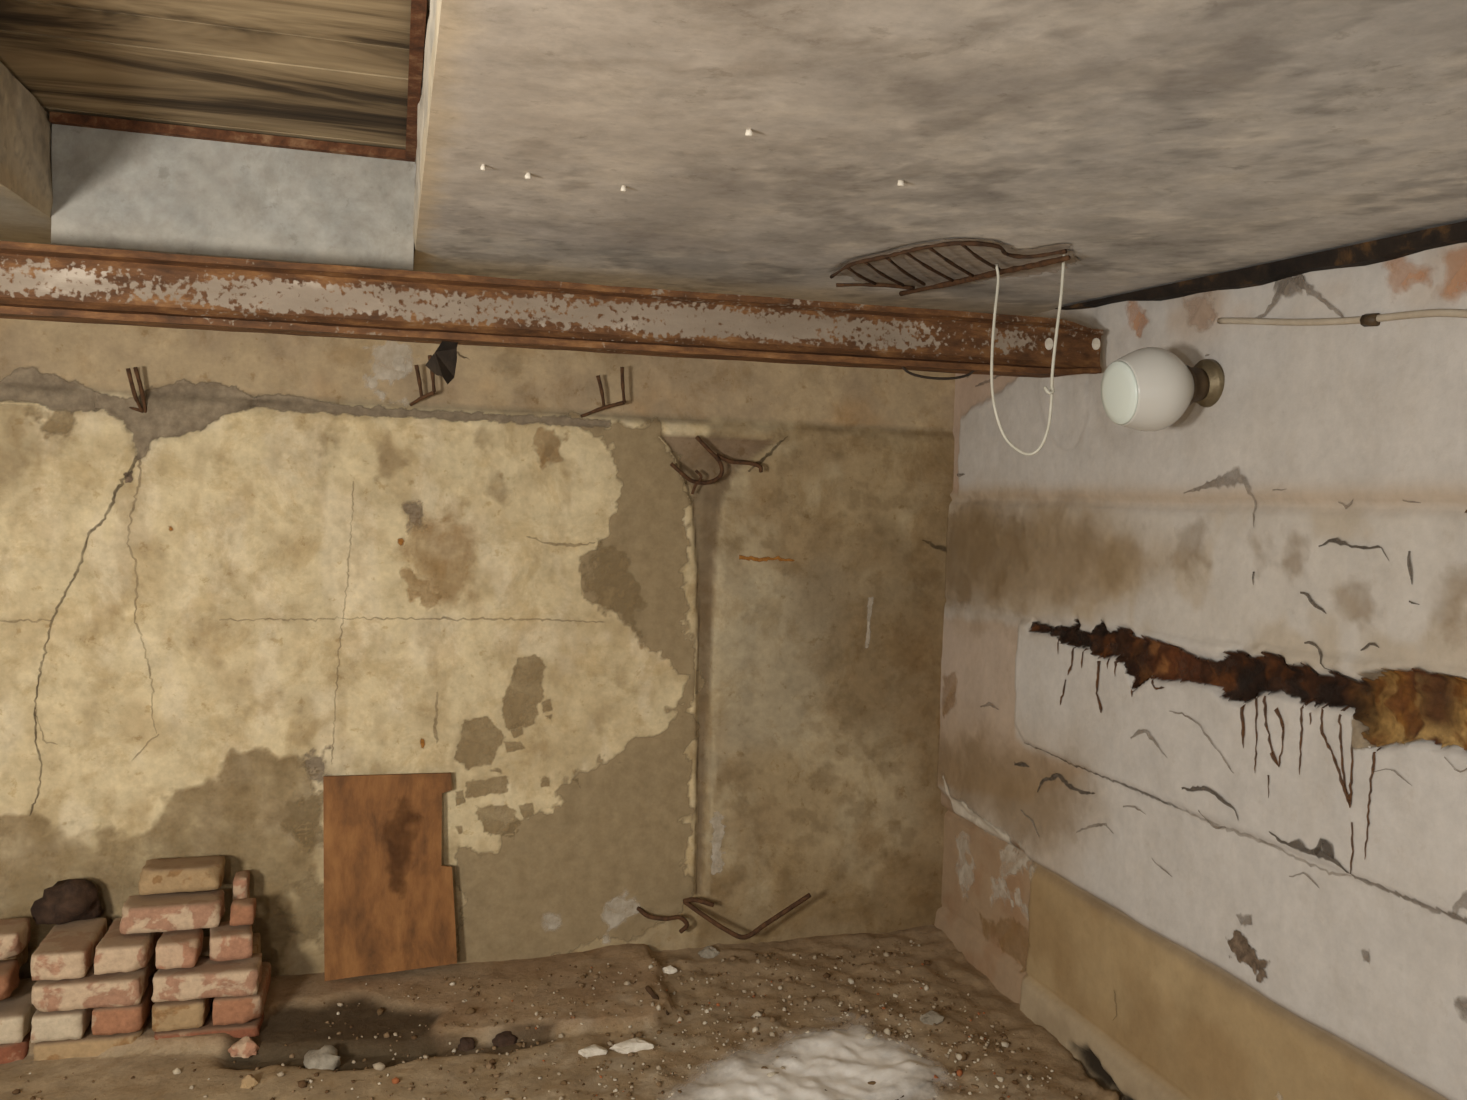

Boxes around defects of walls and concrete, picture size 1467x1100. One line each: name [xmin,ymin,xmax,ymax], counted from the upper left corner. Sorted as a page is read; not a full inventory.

spalling [830,238,1080,296]
peeling [1259,274,1344,318]
crack [31,461,136,812]
peeling [0,355,811,964]
rust [1029,619,1467,874]
crack [1351,874,1467,924]